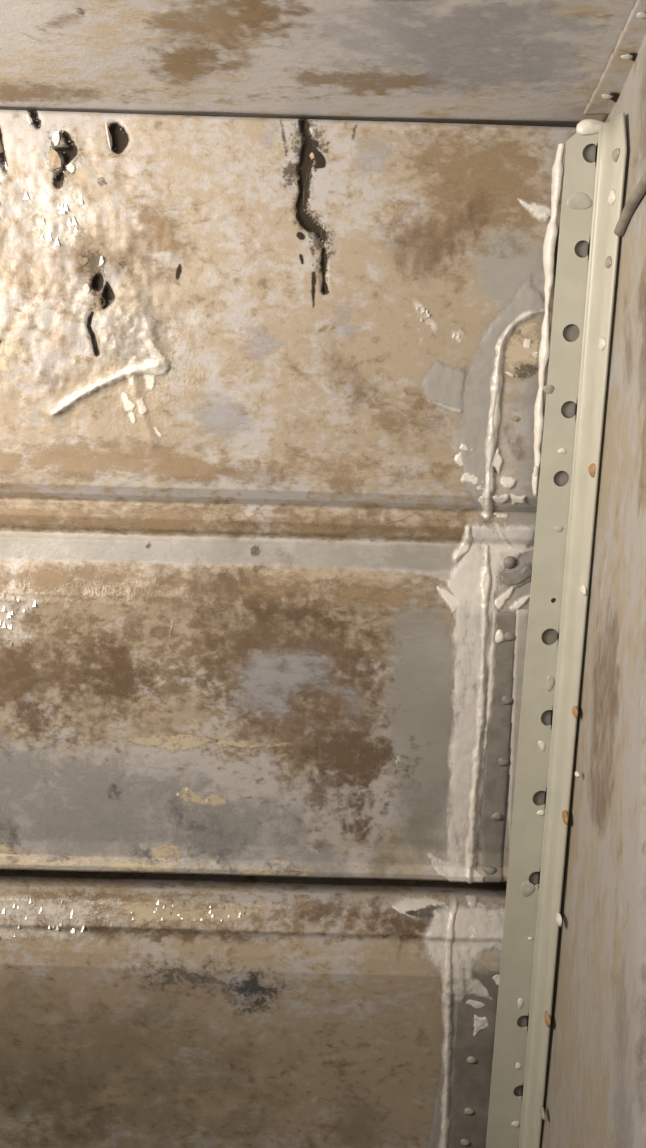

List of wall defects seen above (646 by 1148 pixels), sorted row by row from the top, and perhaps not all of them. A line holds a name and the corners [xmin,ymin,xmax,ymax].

spalling [0,130,8,208]
peeling [23,110,84,248]
spalling [105,122,129,157]
crack [280,119,357,308]
peeling [83,284,106,308]
damp [139,331,164,358]
damp [121,374,155,423]
damp [239,651,326,713]
damp [0,746,344,877]